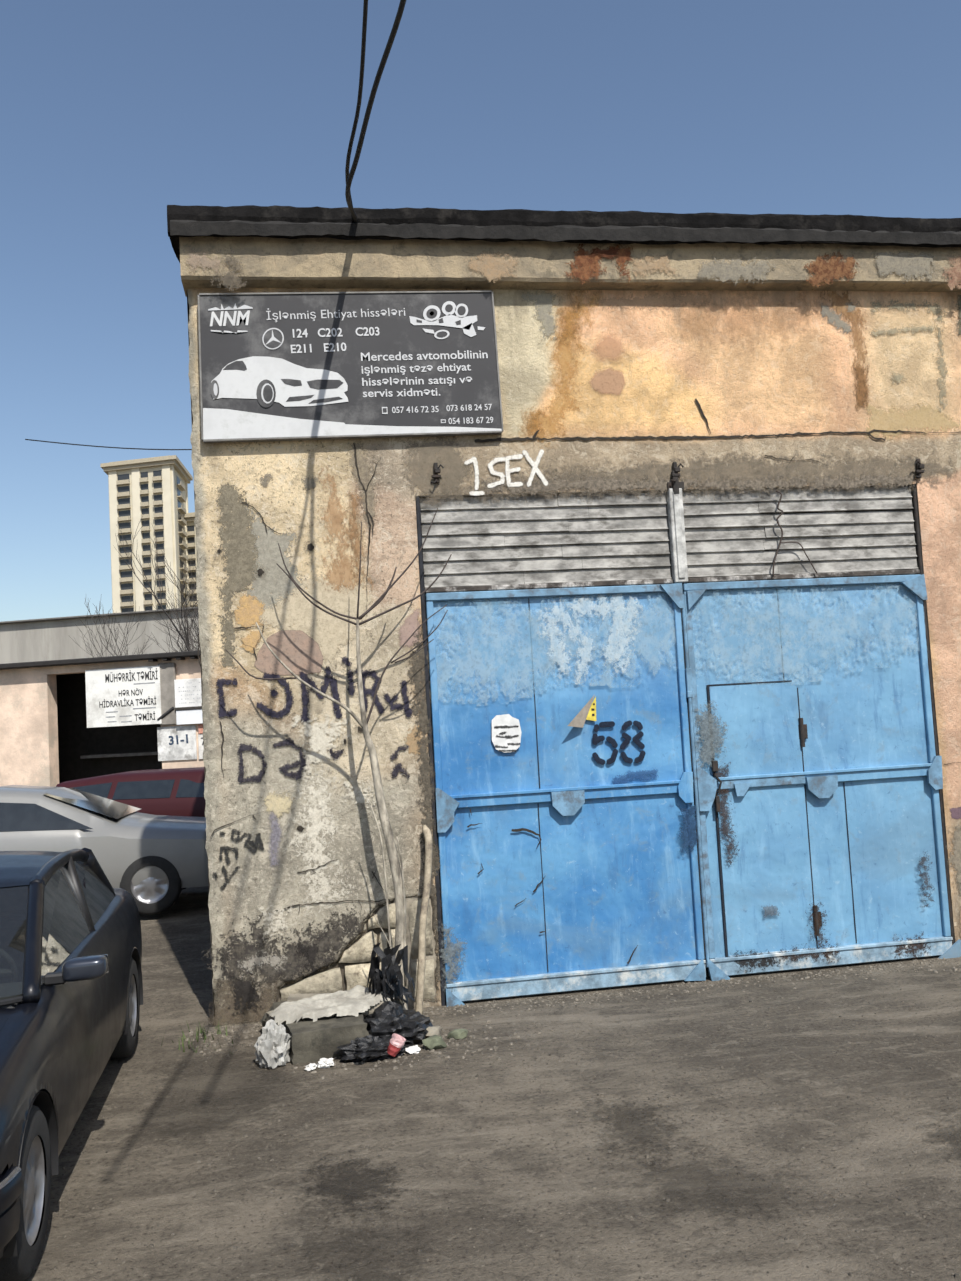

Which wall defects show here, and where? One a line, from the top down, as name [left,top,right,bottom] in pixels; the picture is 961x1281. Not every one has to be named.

corrosion [526,243,633,441]
spalling [592,254,776,310]
corrosion [804,250,870,408]
flaking render [819,298,961,441]
spalling [875,251,961,290]
flaking render [214,474,373,669]
corrosion [678,700,740,866]
corrosion [917,850,935,908]
water stain [201,904,370,1025]